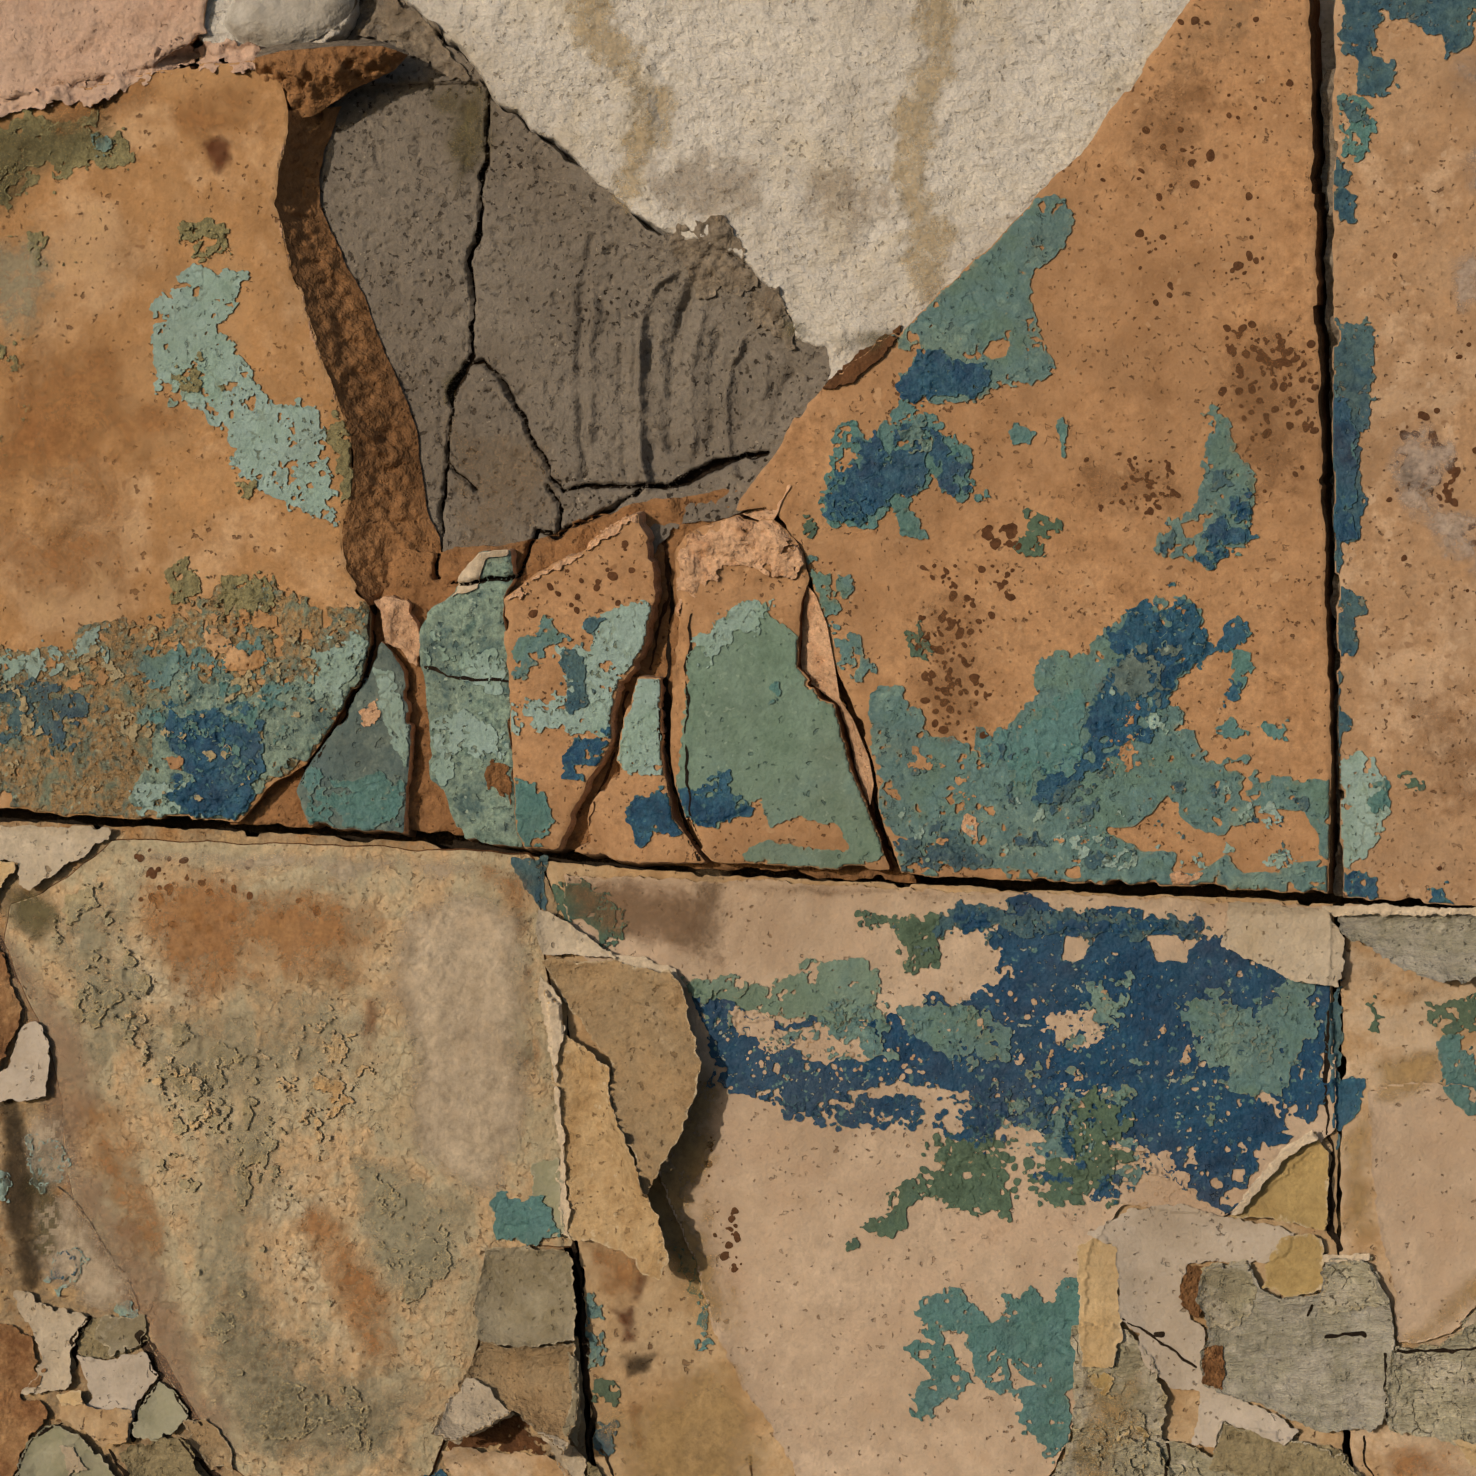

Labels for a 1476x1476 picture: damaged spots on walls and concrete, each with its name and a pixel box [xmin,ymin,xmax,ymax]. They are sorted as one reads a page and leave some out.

crack [435,91,770,586]
flaking render [0,0,1329,892]
peeling [1098,316,1378,656]
spalling [134,848,254,941]
crack [872,792,900,869]
peeling [0,1134,71,1203]
peeling [50,882,375,1211]
peeling [423,705,1476,1476]
crack [1322,1010,1343,1252]
peeling [259,1382,371,1450]
crack [571,1239,614,1476]